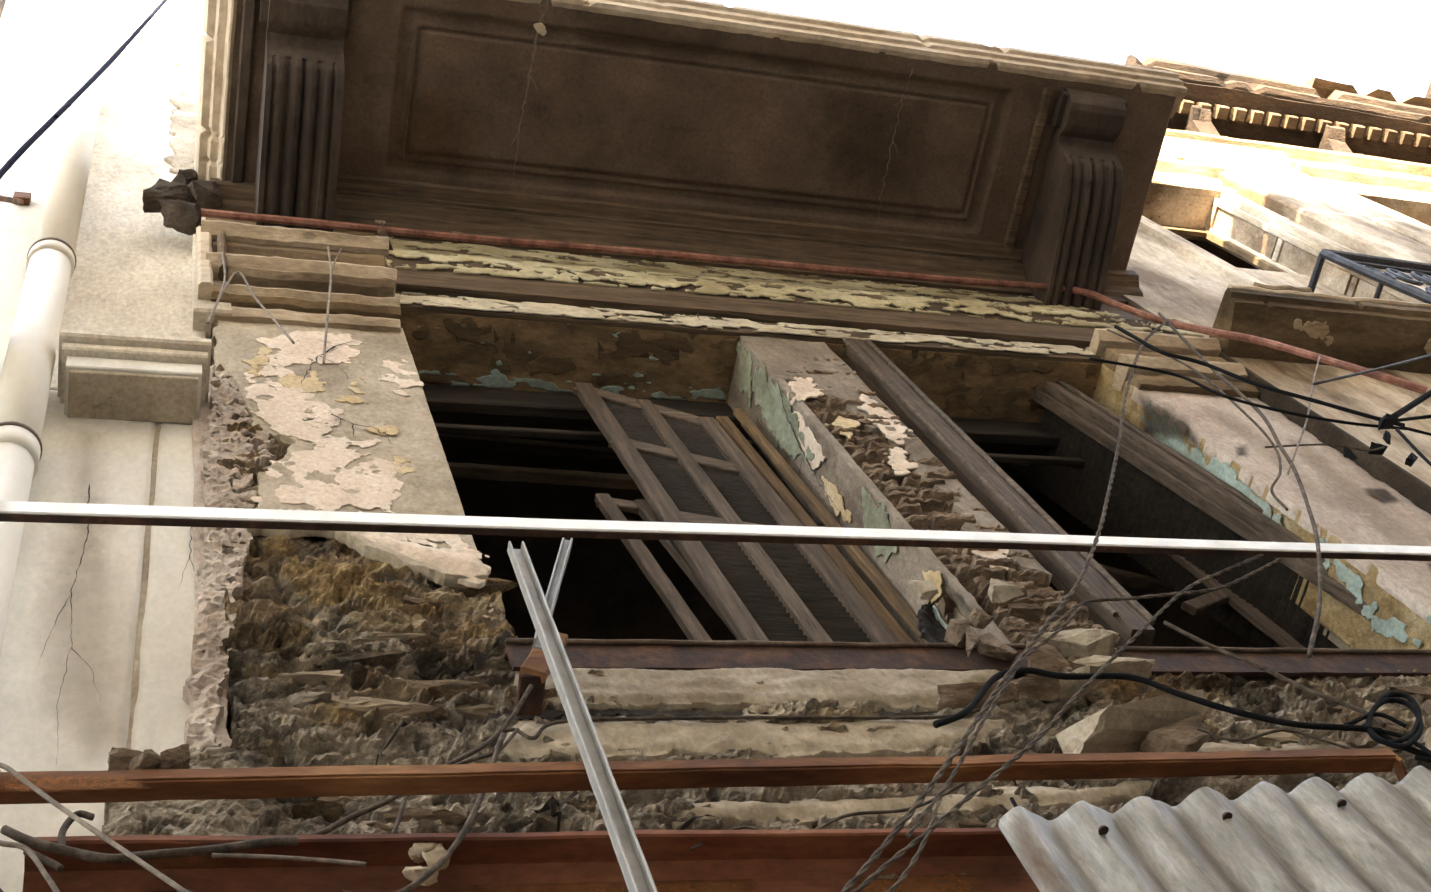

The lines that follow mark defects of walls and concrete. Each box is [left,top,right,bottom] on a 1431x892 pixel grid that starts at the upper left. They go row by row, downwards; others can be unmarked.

peeling [375,235,1204,337]
peeling [1294,319,1335,346]
flaking render [200,292,1105,676]
peeling [1141,415,1282,526]
crack [38,484,101,765]
flaking render [182,527,549,767]
peeling [1319,538,1422,649]
flaking render [255,792,570,836]
rust [655,879,748,892]
rust [859,874,980,892]